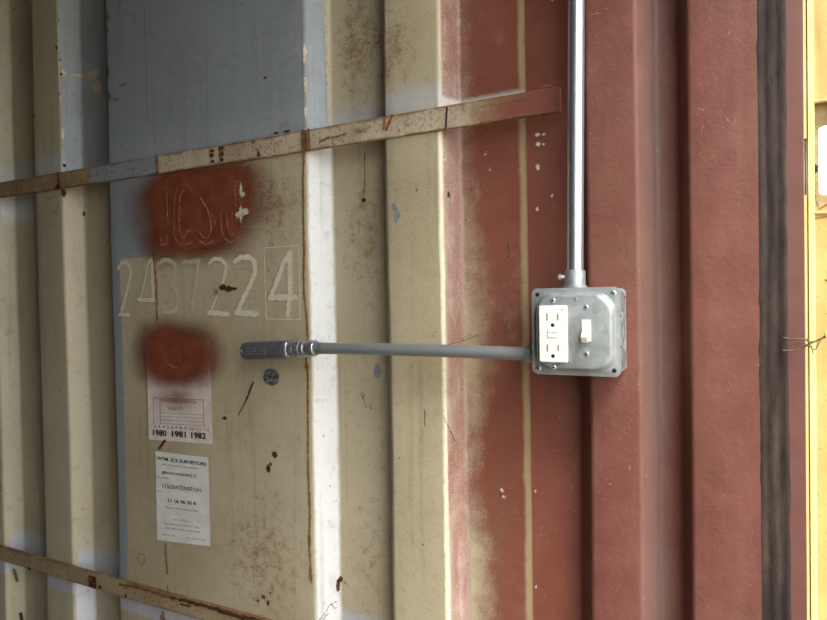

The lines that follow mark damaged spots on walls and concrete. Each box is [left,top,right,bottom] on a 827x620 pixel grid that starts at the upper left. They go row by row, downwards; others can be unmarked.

rust [119,584,261,620]